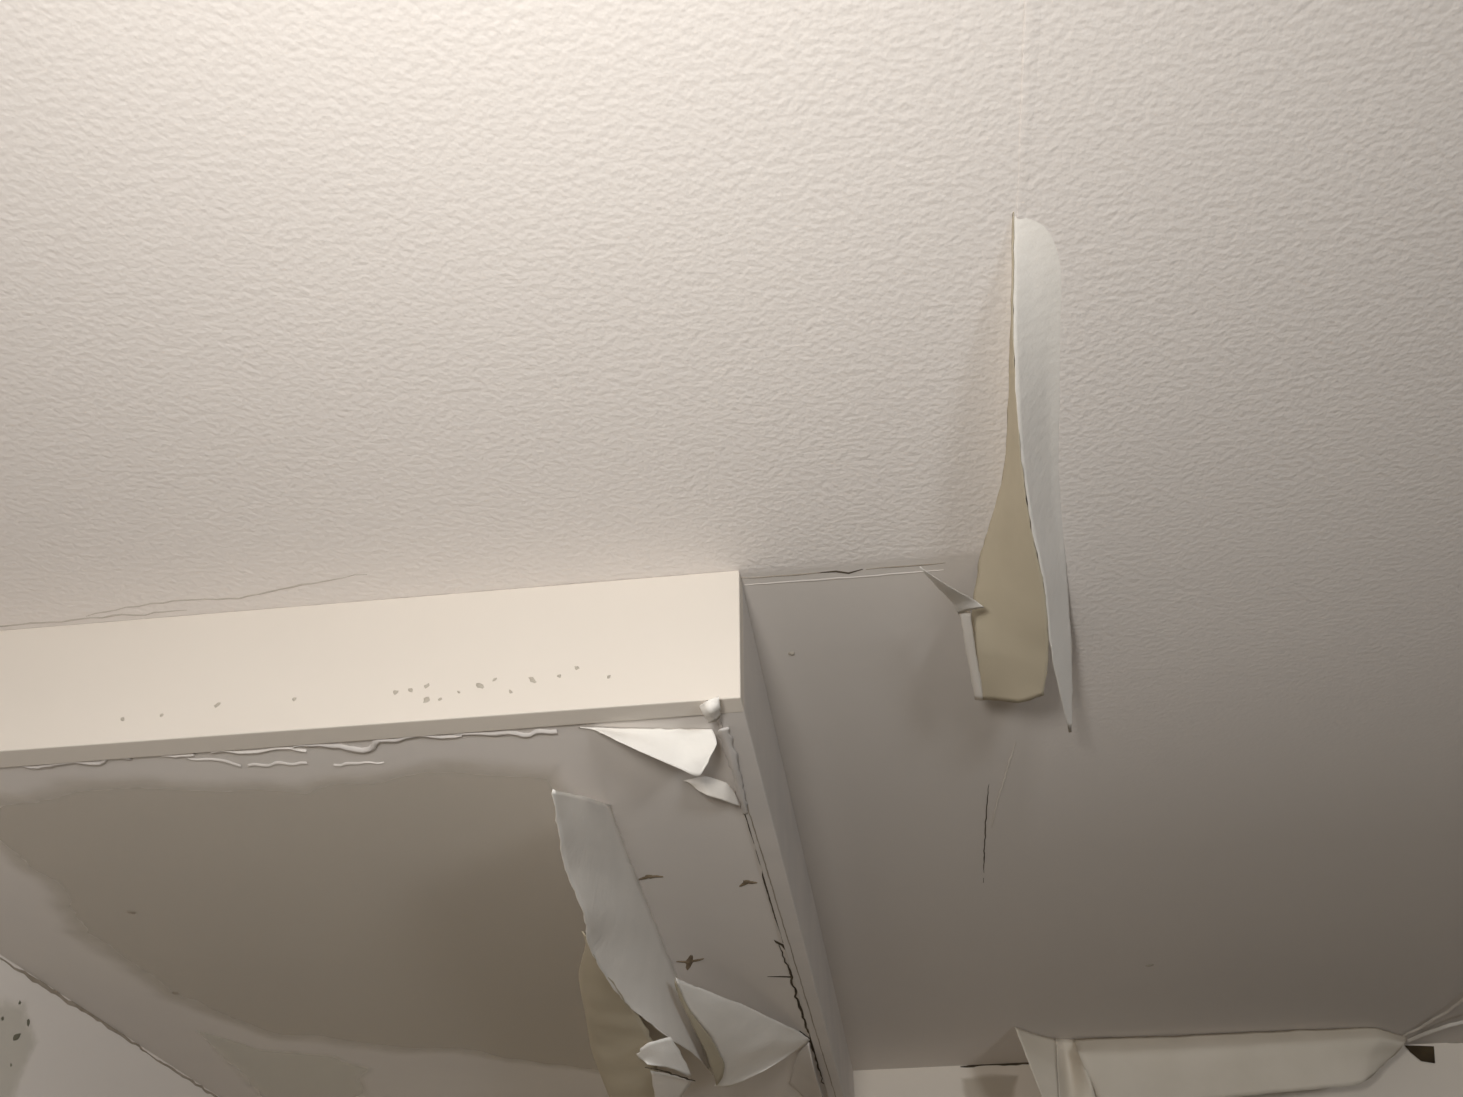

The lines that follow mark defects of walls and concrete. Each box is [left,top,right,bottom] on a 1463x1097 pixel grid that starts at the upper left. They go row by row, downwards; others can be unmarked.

peeling [578,696,748,814]
peeling [674,977,823,1097]